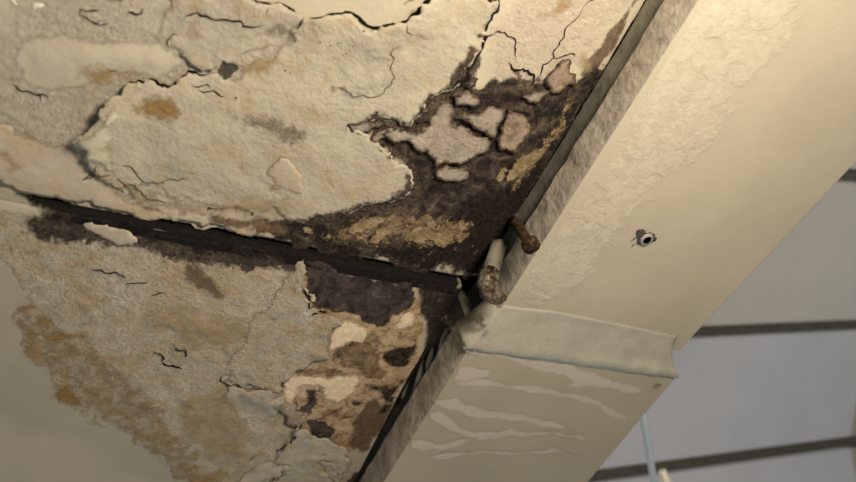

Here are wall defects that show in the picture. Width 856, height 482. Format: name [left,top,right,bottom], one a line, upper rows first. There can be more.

peeling [0,0,546,248]
crack [166,0,431,98]
crack [447,0,593,95]
peeling [522,59,576,104]
damp [0,0,647,482]
flaking render [224,260,425,482]